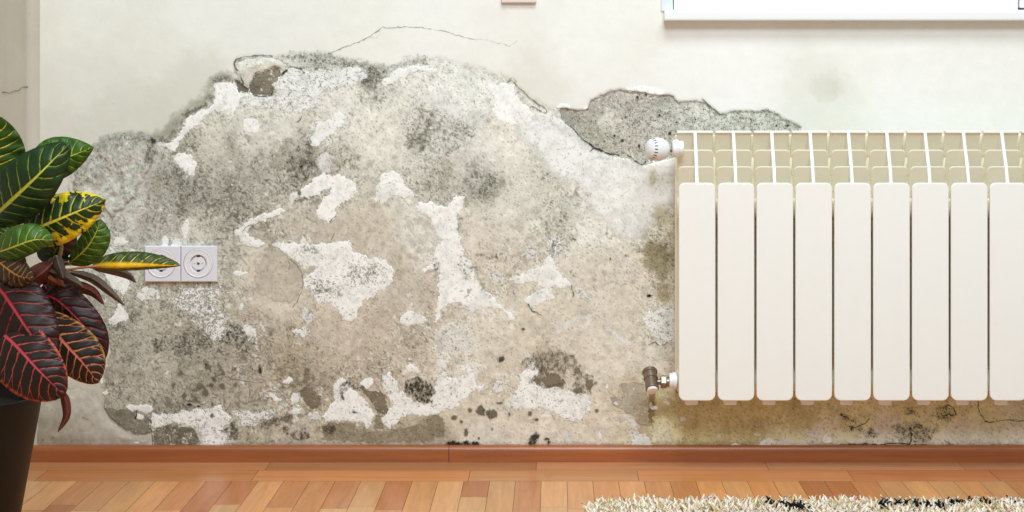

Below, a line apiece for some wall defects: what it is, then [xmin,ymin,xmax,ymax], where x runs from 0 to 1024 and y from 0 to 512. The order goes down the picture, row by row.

leakage [151,95,212,143]
peeling [83,53,801,445]
leakage [172,363,237,417]
leakage [261,414,336,440]
leakage [405,377,436,403]
leakage [447,402,510,445]
leakage [522,350,597,393]
leakage [647,376,1024,445]
crack [843,418,954,445]